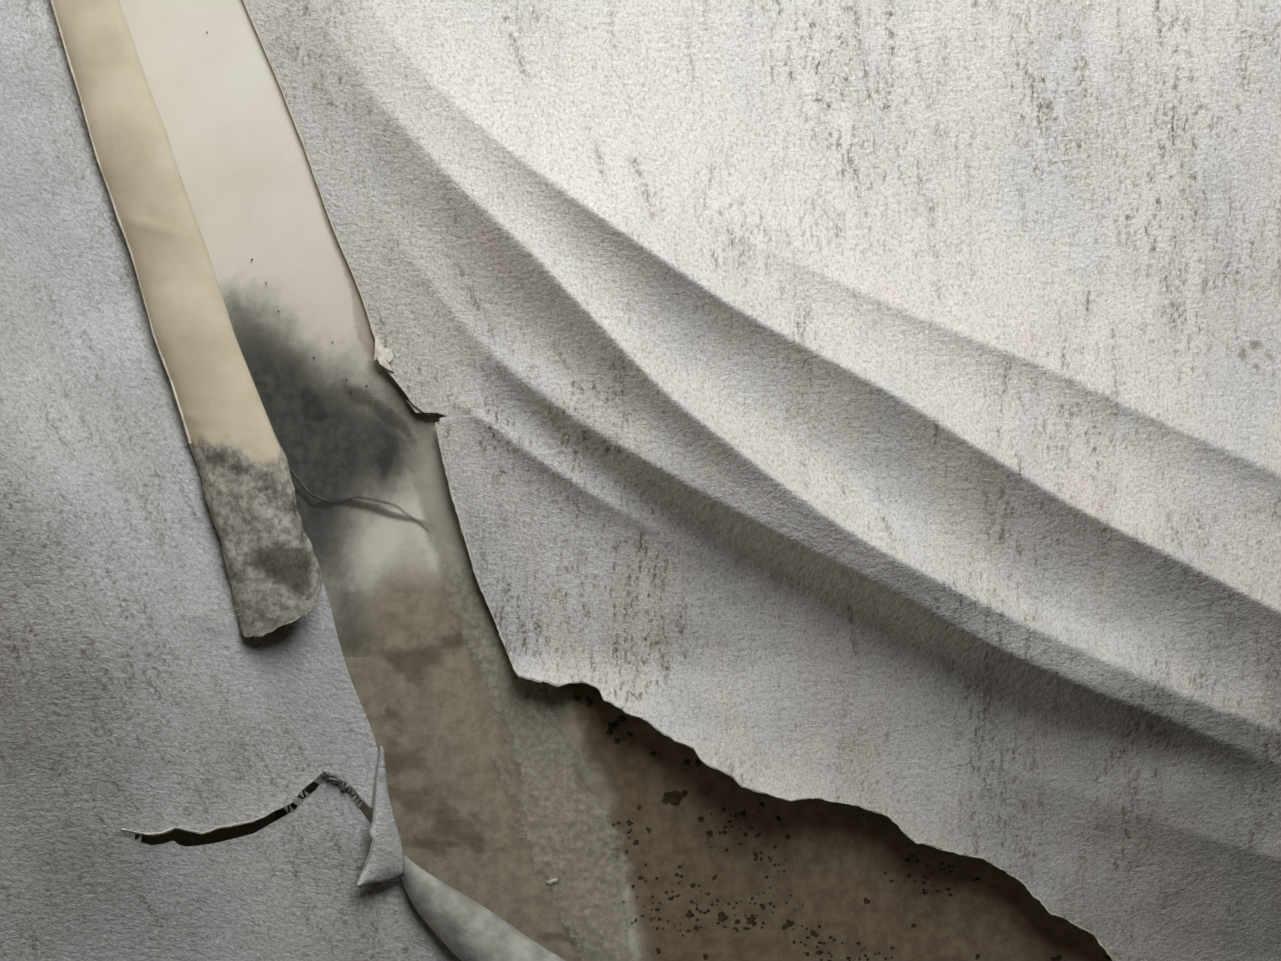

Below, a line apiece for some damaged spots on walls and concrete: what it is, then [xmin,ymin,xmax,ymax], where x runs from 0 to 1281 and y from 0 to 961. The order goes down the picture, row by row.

damp [189,306,429,636]
peeling [374,335,394,372]
damp [275,781,319,821]
damp [335,579,582,961]